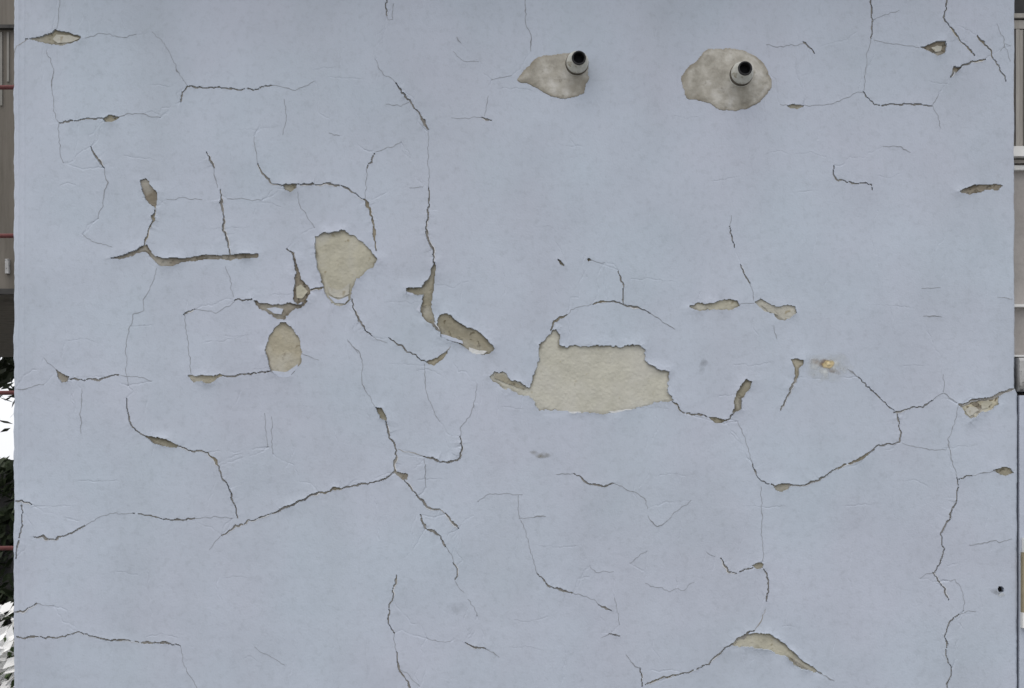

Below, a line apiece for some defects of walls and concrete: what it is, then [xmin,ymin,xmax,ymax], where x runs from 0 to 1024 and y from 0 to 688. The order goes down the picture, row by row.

crack [780,0,1010,126]
crack [377,63,435,263]
peeling [960,184,1002,195]
crack [18,142,401,431]
peeling [235,230,387,377]
peeling [406,263,494,355]
peeling [490,329,673,415]
peeling [689,299,797,338]
crack [16,338,477,613]
crack [672,369,1013,685]
crack [15,603,197,688]
peeling [645,630,834,685]